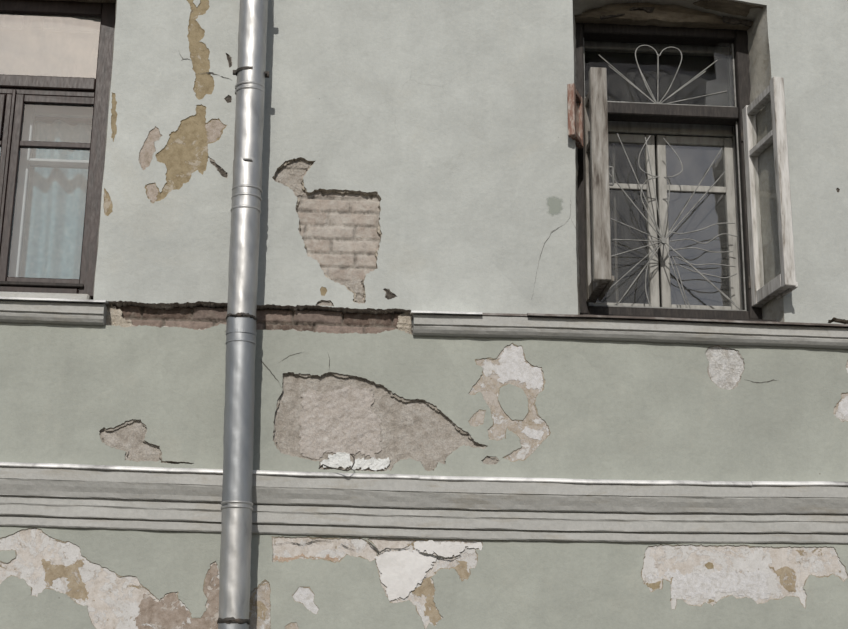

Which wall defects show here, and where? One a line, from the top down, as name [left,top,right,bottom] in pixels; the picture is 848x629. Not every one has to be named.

peeling [138,0,228,203]
spalling [256,157,413,335]
spalling [105,301,227,310]
spalling [705,345,745,390]
spalling [273,343,551,472]
peeling [833,392,848,422]
spalling [99,419,194,464]
peeling [271,536,378,563]
peeling [0,527,220,629]
peeling [249,580,271,629]
peeling [292,586,319,614]
peeling [641,544,848,610]